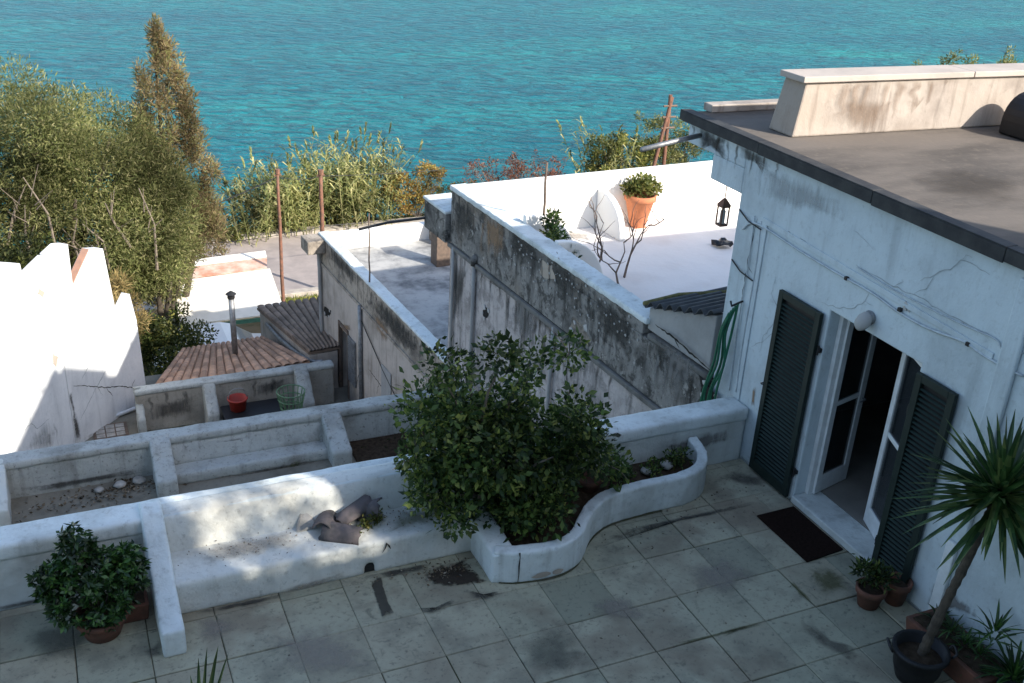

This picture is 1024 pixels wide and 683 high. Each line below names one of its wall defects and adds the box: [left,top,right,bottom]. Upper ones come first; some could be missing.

water stain [701,131,765,167]
water stain [481,221,536,265]
water stain [454,263,463,305]
water stain [549,263,582,301]
crack [822,231,988,334]
water stain [496,283,564,365]
water stain [592,300,631,360]
crack [80,364,135,420]
water stain [148,394,187,417]